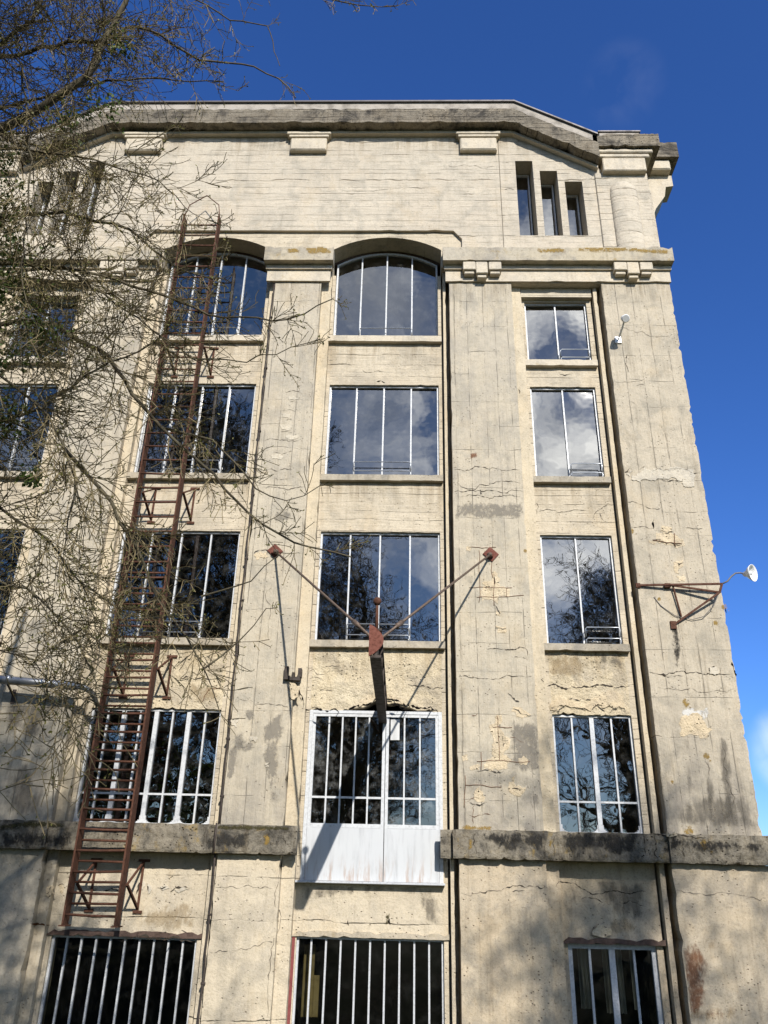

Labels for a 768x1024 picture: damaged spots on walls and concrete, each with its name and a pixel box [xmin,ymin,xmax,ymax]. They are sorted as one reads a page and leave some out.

peeling [621,467,696,487]
damp [457,504,522,518]
crack [454,466,658,535]
spalling [649,525,685,548]
crack [651,671,731,693]
spalling [679,713,712,739]
spalling [462,693,539,806]
damp [497,837,519,850]
crack [465,881,762,906]
corrosion [686,949,703,1013]